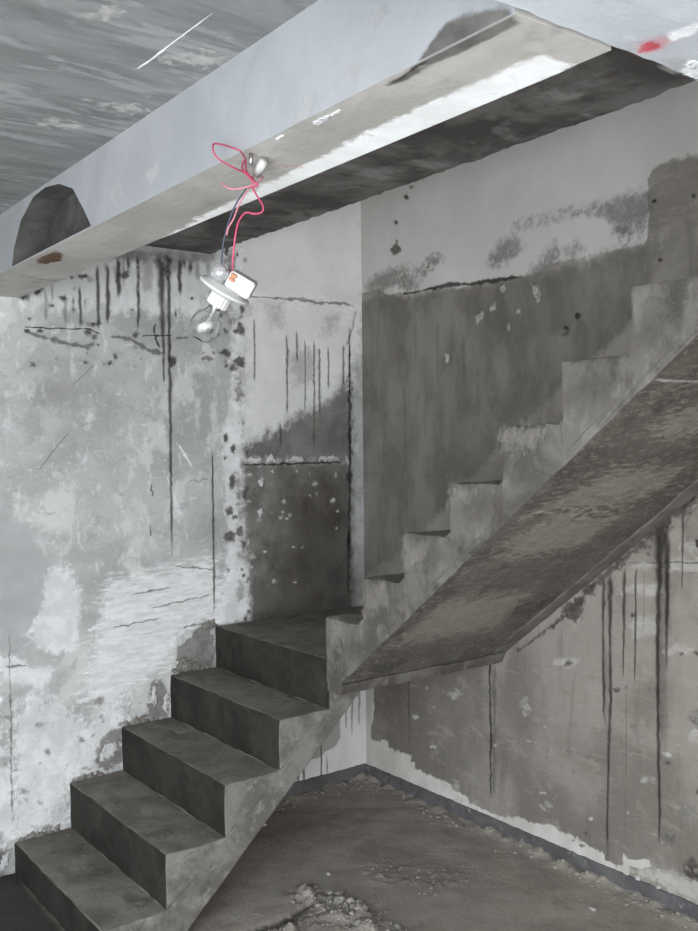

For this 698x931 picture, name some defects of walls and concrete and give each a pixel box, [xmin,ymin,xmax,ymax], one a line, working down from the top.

spalling [683,60,698,79]
peeling [313,109,342,125]
leakage [593,193,649,235]
rust [37,251,62,264]
peeling [224,248,243,271]
leakage [213,306,255,380]
leakage [20,256,213,535]
leakage [212,329,353,621]
spalling [0,302,252,873]
leakage [517,495,697,843]
peeling [313,688,698,898]
leakage [683,858,698,880]